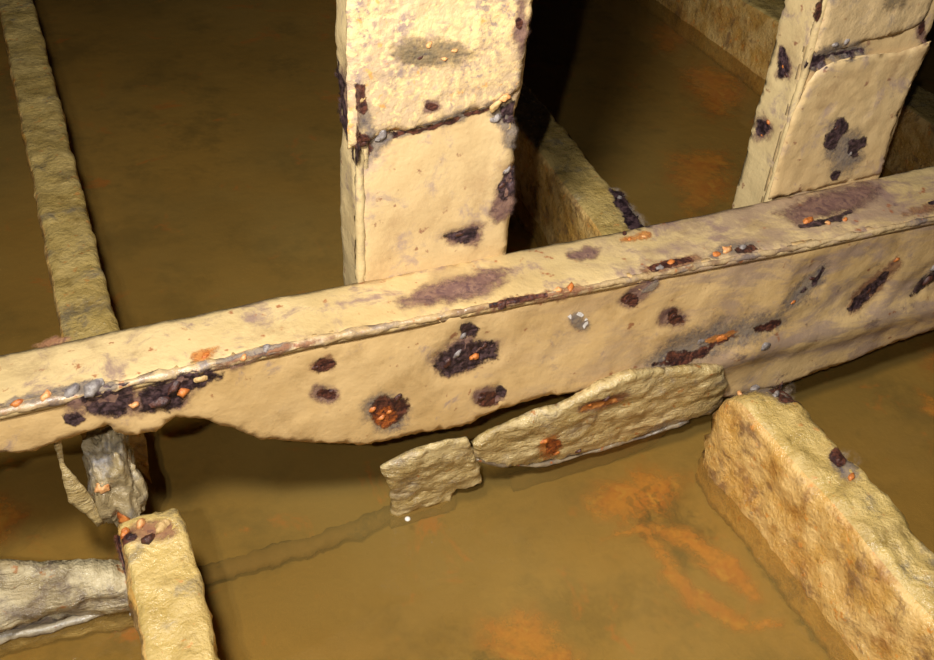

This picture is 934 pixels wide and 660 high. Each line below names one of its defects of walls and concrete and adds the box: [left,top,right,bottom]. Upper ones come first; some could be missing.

corrosion [776,46,792,78]
corrosion [335,59,392,165]
corrosion [779,117,881,228]
corrosion [489,166,515,224]
corrosion [609,187,651,241]
corrosion [443,223,484,246]
corrosion [641,242,757,272]
spalling [310,355,337,373]
corrosion [1,340,316,426]
spalling [311,385,339,404]
spalling [370,395,410,425]
spalling [477,385,507,407]